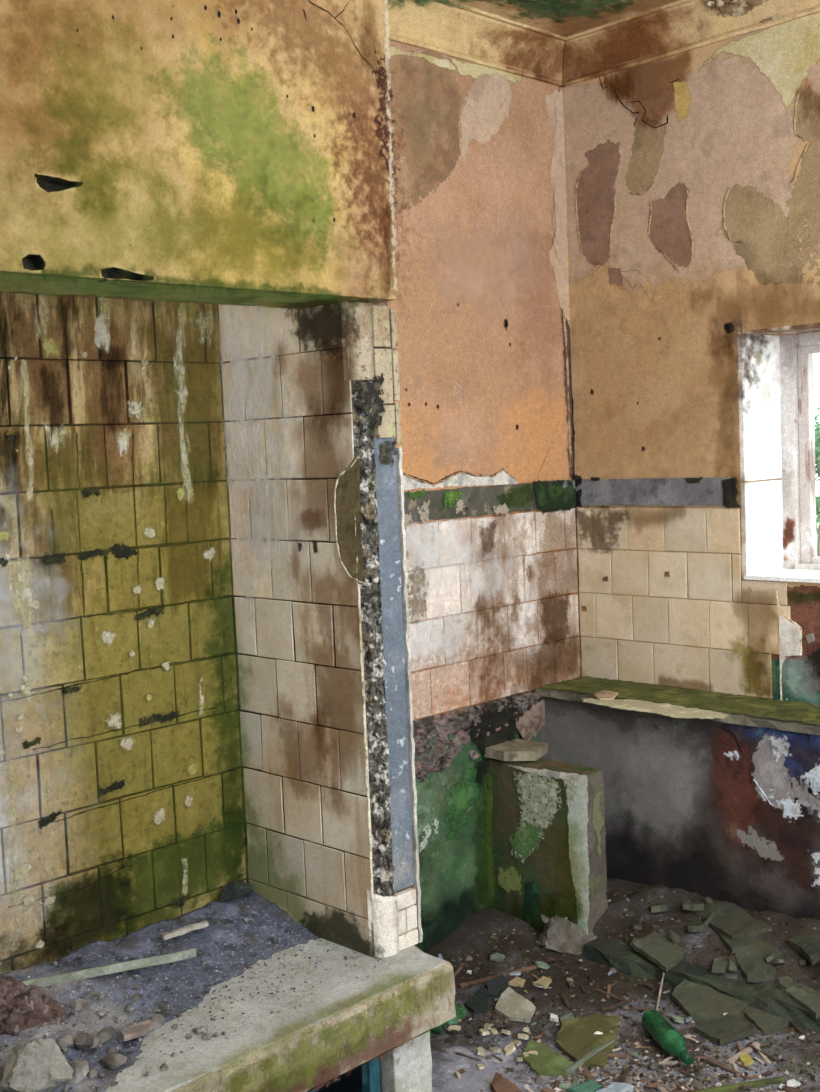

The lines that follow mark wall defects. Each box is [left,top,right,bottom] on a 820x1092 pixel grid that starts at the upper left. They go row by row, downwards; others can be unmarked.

crack [303,0,379,77]
leakage [498,0,633,22]
peeling [383,0,513,289]
peeling [545,56,820,328]
flaking render [403,468,518,525]
leakage [407,566,428,622]
peeling [724,733,820,823]
peeling [734,826,785,862]
peeling [807,850,820,886]